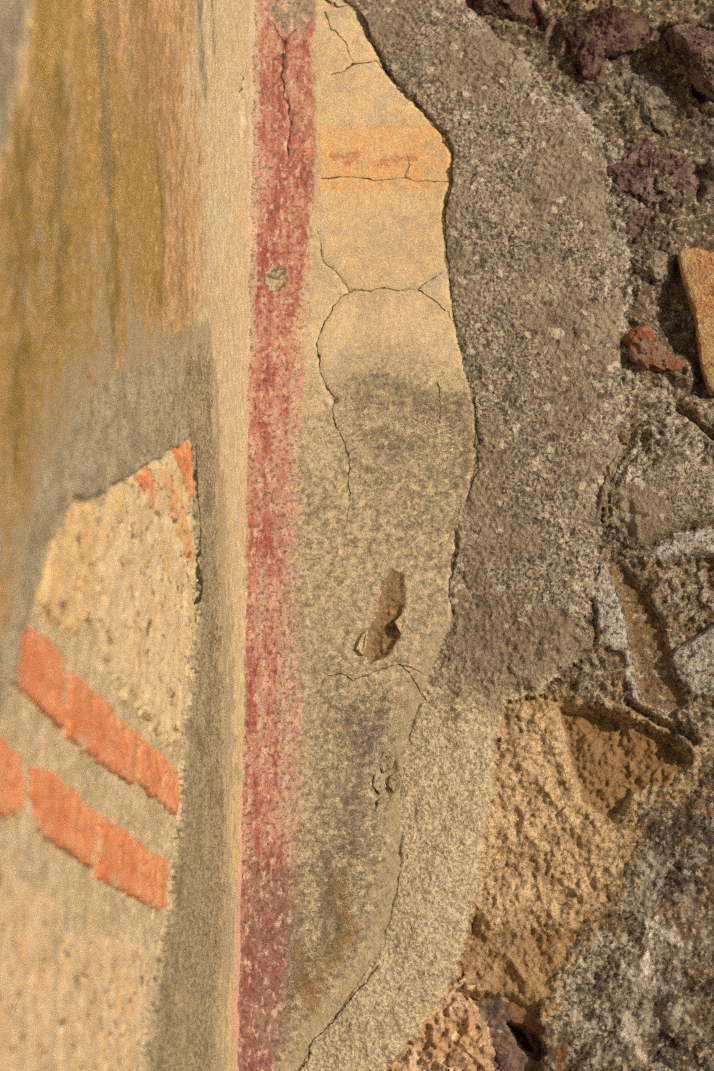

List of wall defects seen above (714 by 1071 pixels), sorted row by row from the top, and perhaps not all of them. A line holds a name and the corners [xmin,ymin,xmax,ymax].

crack [272,22,299,156]
crack [316,0,457,529]
spalling [0,439,201,1071]
crack [328,664,433,700]
spalling [356,568,408,664]
crack [448,396,479,618]
spalling [385,694,685,1071]
crack [300,965,379,1071]